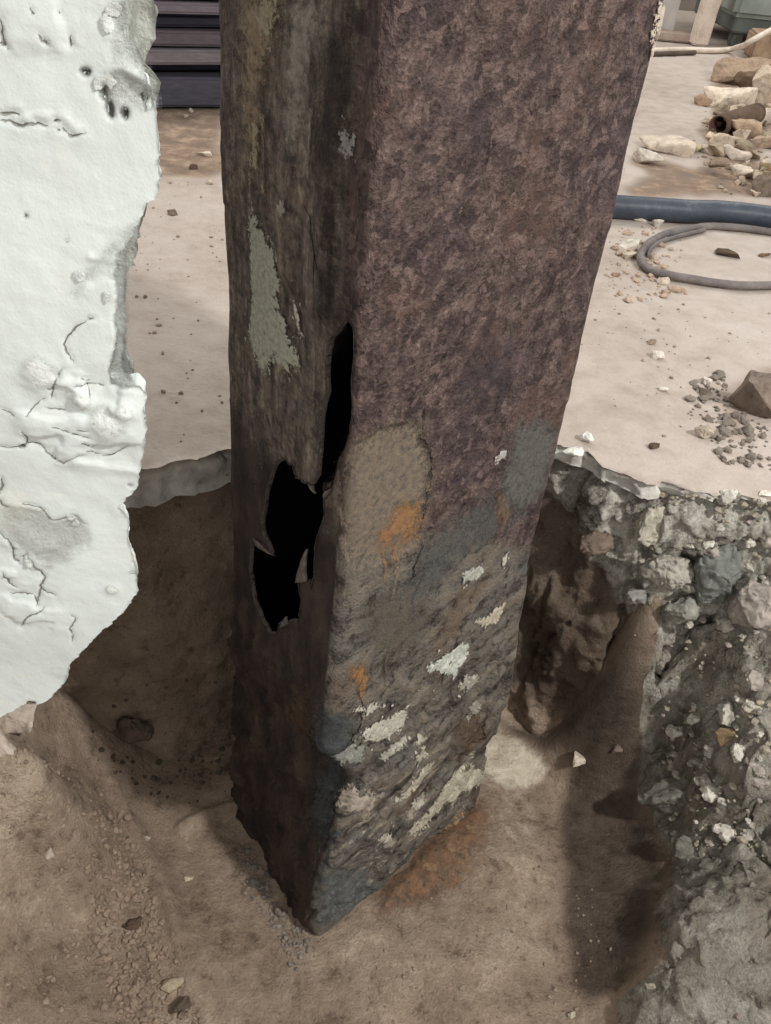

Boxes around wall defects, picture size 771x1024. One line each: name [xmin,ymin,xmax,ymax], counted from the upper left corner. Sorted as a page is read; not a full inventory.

crack [0,112,84,137]
crack [1,318,127,464]
crack [0,478,85,524]
crack [0,532,56,625]
peeling [295,549,309,583]
corrosion [376,503,423,577]
corrosion [378,799,488,914]